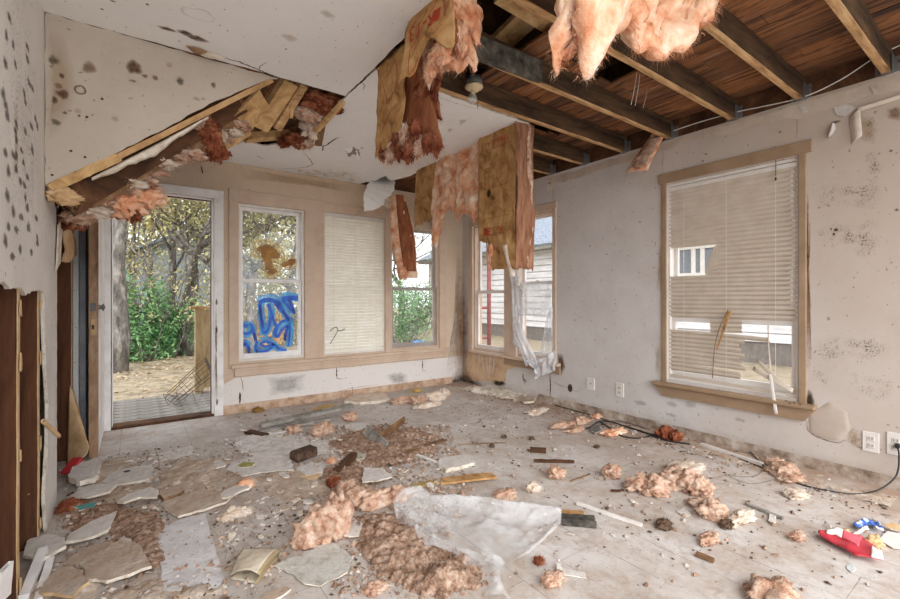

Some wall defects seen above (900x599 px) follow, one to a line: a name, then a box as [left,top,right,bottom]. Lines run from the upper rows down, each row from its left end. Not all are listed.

water stain [127,61,157,82]
water stain [53,74,86,103]
peeling [828,104,855,138]
water stain [2,79,39,259]
flaking render [44,186,85,212]